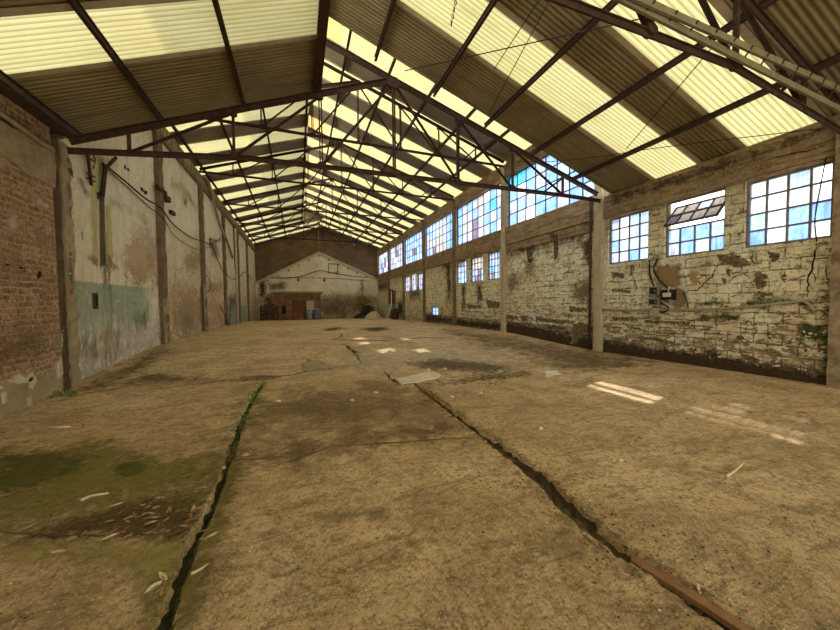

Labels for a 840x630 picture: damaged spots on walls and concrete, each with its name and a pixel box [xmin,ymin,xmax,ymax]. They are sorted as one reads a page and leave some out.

damp [506,233,589,275]
peeling [656,265,702,306]
peeling [716,254,777,297]
crack [806,243,829,297]
crack [332,333,439,366]
peeling [506,305,593,344]
damp [426,280,830,385]
spalling [0,358,64,417]